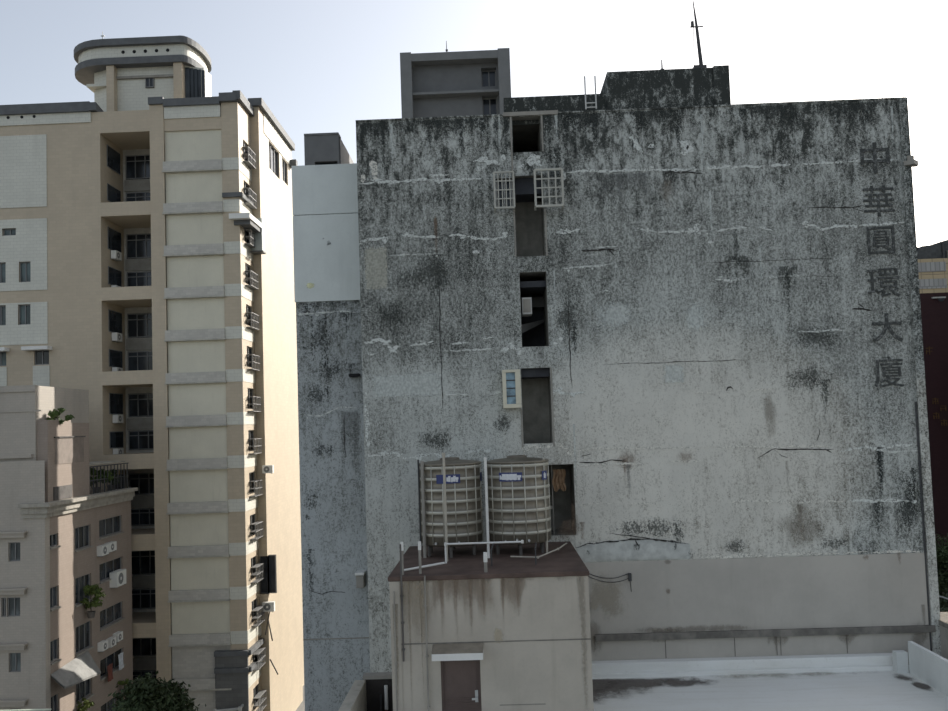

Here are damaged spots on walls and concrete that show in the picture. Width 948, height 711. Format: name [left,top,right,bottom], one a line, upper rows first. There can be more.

leakage [360,116,509,164]
leakage [545,113,603,196]
peeling [360,154,506,184]
peeling [563,158,898,180]
crack [810,204,864,212]
peeling [799,221,904,231]
peeling [402,232,508,254]
crack [579,248,616,256]
peeling [364,338,434,356]
crack [758,430,832,458]
leakage [616,519,684,543]
leakage [592,678,706,702]